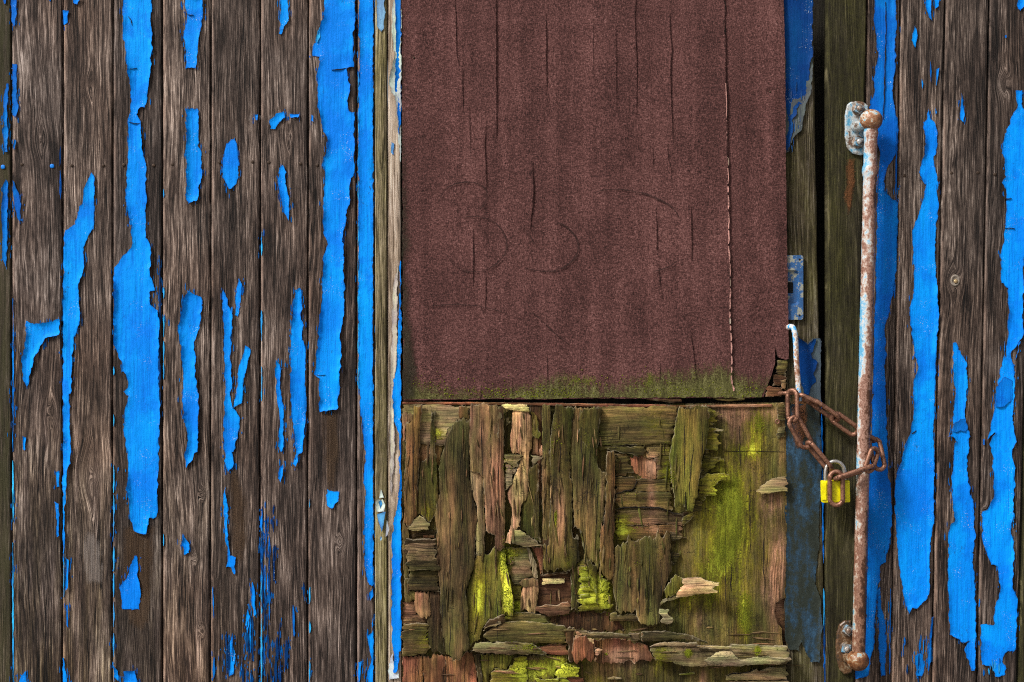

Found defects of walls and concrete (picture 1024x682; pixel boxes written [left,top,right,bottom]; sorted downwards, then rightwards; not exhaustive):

peeling [1,64,20,155]
peeling [3,0,20,29]
peeling [0,180,25,269]
peeling [7,173,97,627]
peeling [109,0,206,682]
peeling [212,0,402,682]
damp [401,188,768,400]
peeling [784,0,814,153]
corrosion [793,400,807,447]
corrosion [845,160,854,207]
peeling [855,0,1024,682]
peeling [9,554,29,682]